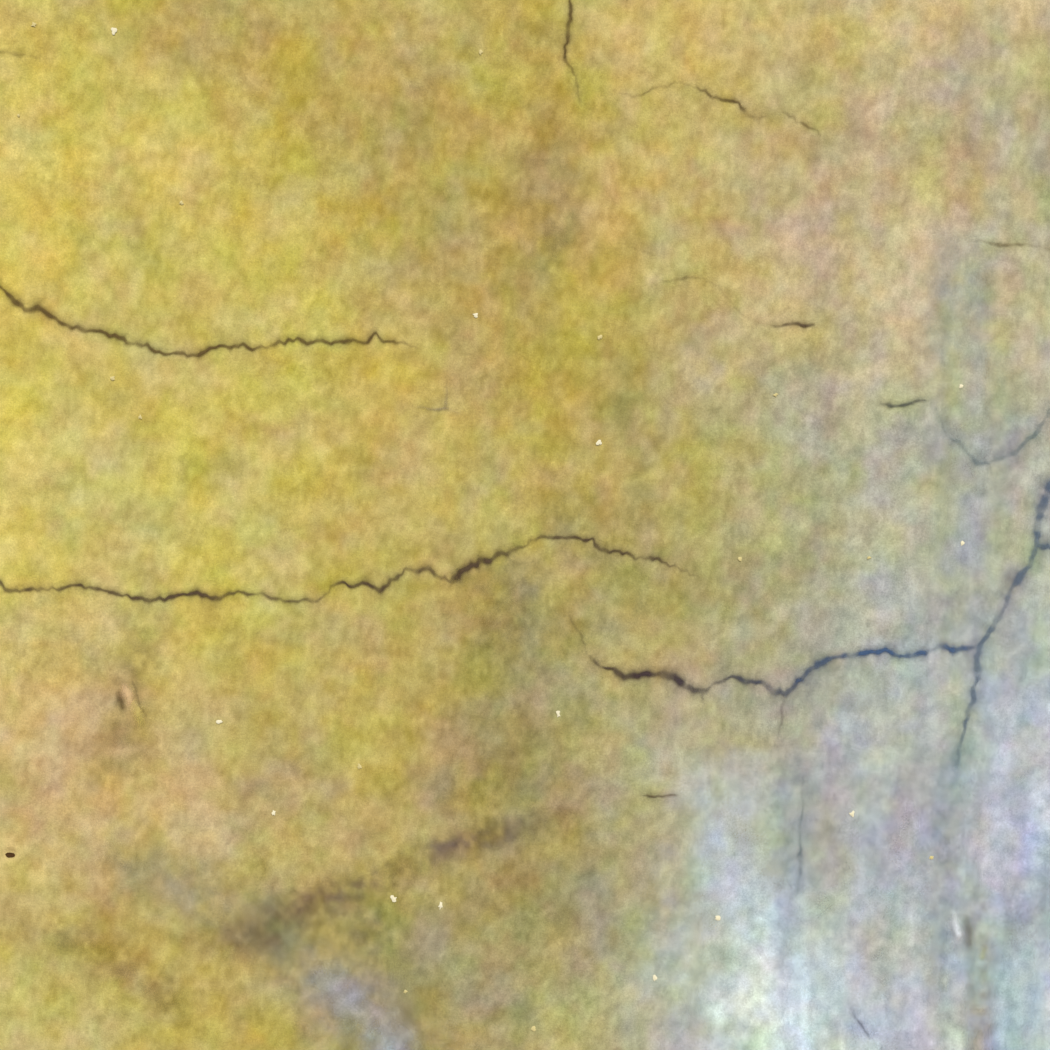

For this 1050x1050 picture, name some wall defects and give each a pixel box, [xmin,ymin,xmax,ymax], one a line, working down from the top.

crack [564,0,573,59]
crack [0,286,395,357]
crack [783,320,812,328]
crack [58,584,298,602]
crack [338,551,507,593]
crack [551,536,663,562]
crack [1013,481,1050,585]
crack [604,667,699,692]
crack [727,627,994,729]
water stain [964,683,1050,1050]
water stain [703,785,967,1050]
water stain [309,970,422,1050]